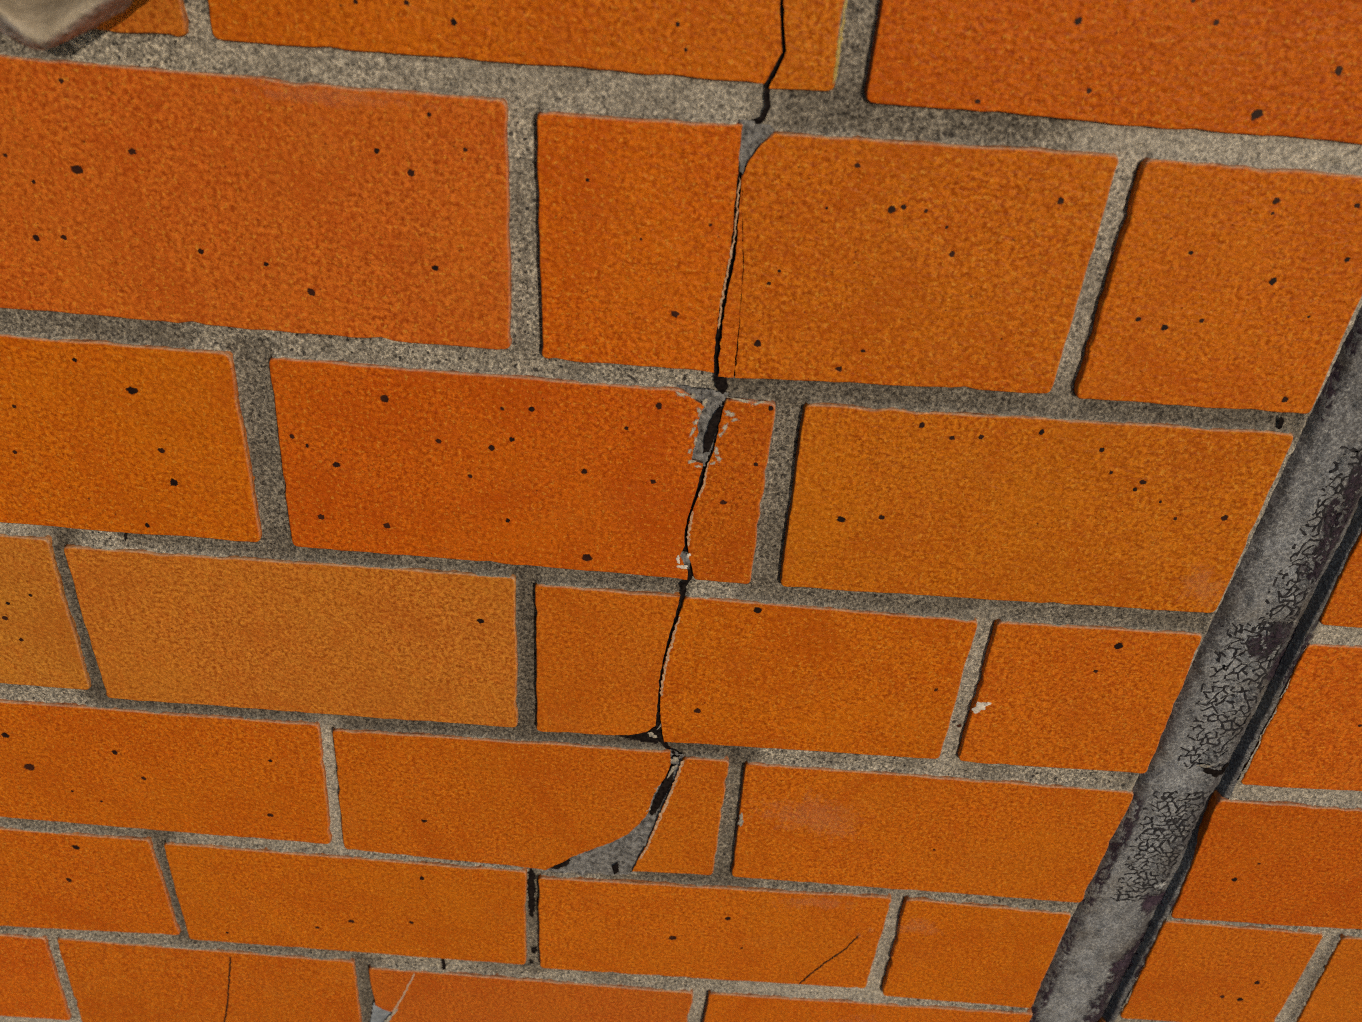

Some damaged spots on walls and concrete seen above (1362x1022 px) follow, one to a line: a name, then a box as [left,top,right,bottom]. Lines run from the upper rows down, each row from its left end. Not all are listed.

crack [750,0,786,124]
spalling [676,385,764,468]
crack [639,162,744,860]
spalling [543,724,685,876]